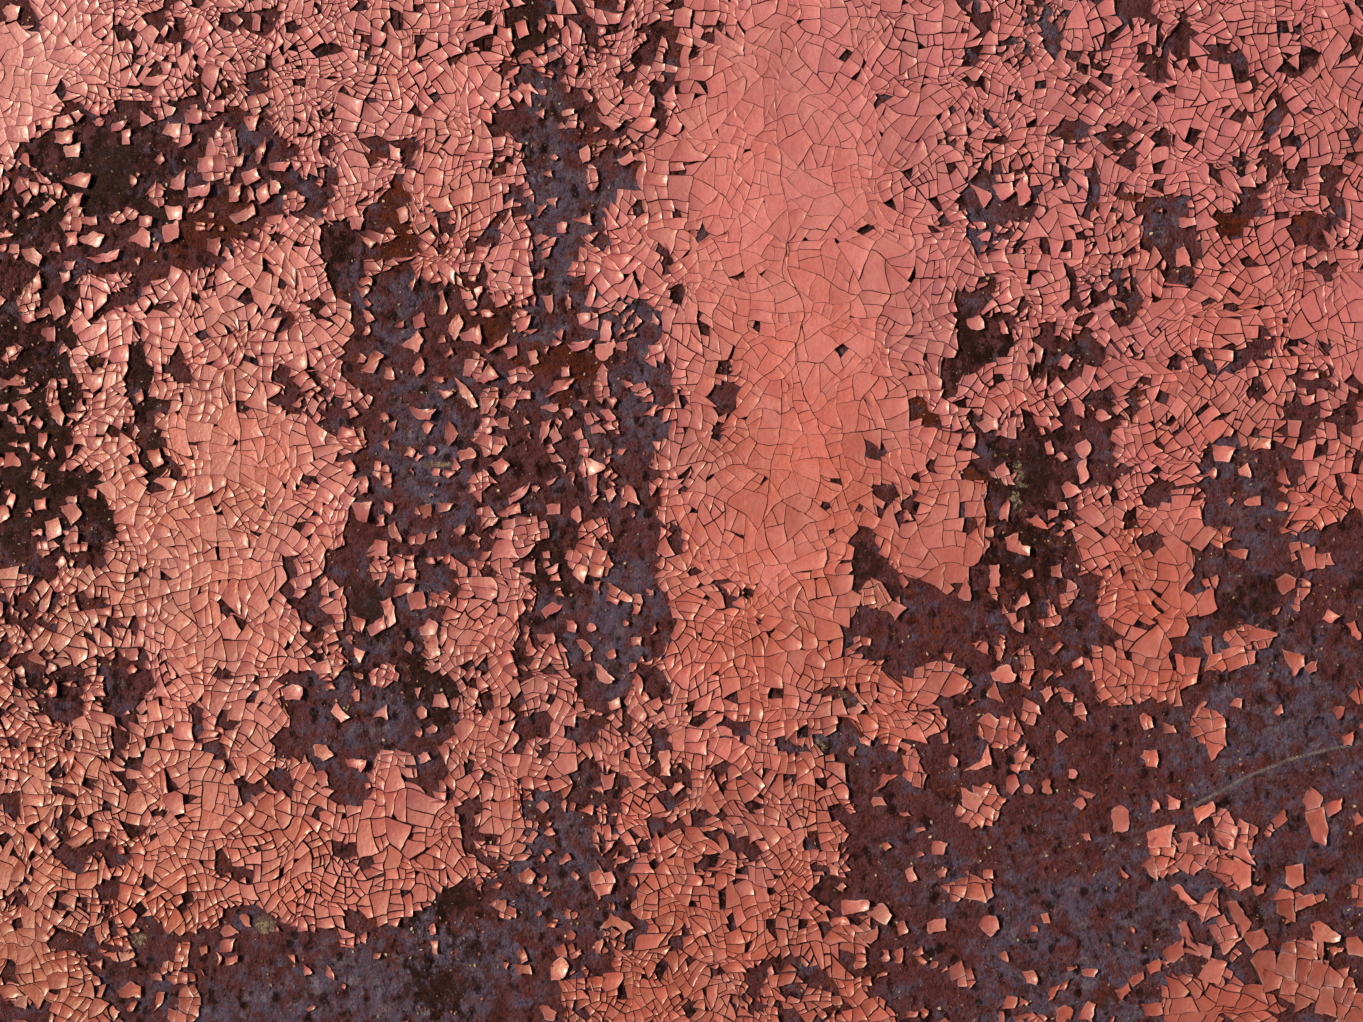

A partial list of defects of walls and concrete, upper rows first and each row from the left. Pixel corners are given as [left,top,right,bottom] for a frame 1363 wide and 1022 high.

crack [43,9,119,84]
crack [463,75,488,162]
rust [11,135,251,258]
rust [456,272,506,338]
crack [732,104,843,558]
rust [0,315,133,559]
peeling [705,375,753,423]
peeling [0,0,737,1022]
peeling [714,0,1363,1022]
crack [133,546,290,643]
rust [527,525,600,602]
peeling [699,569,745,624]